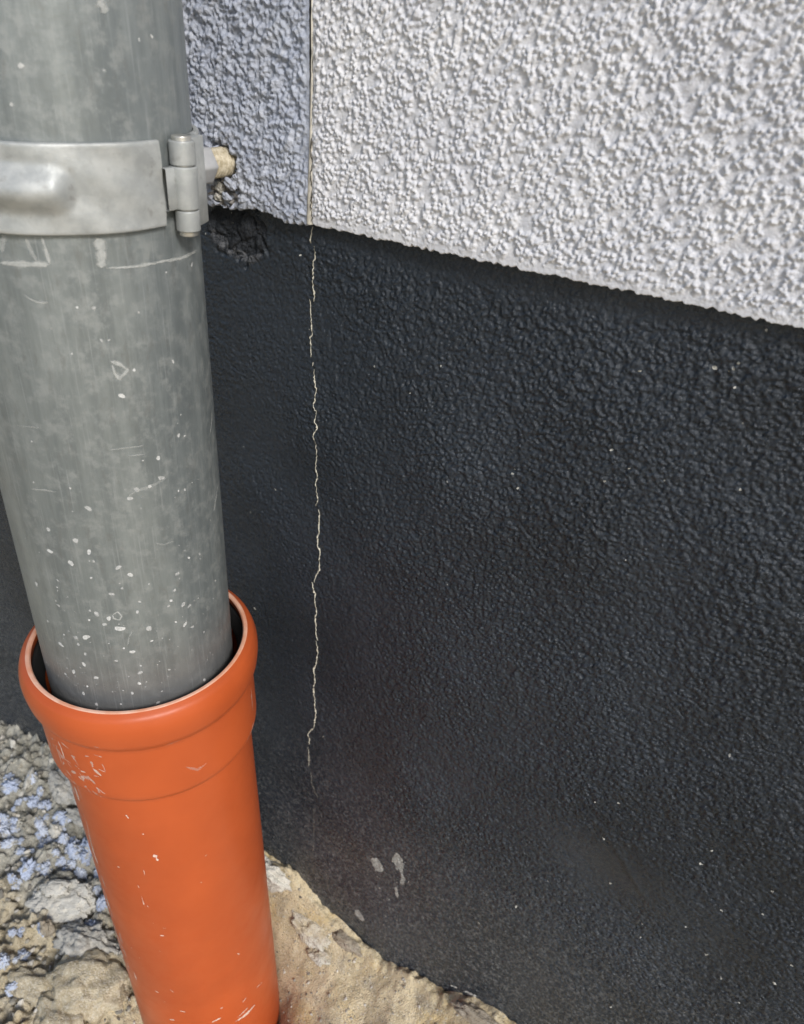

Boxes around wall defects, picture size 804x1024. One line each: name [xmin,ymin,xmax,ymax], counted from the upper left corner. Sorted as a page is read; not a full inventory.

spalling [207,174,267,263]
crack [307,50,320,744]